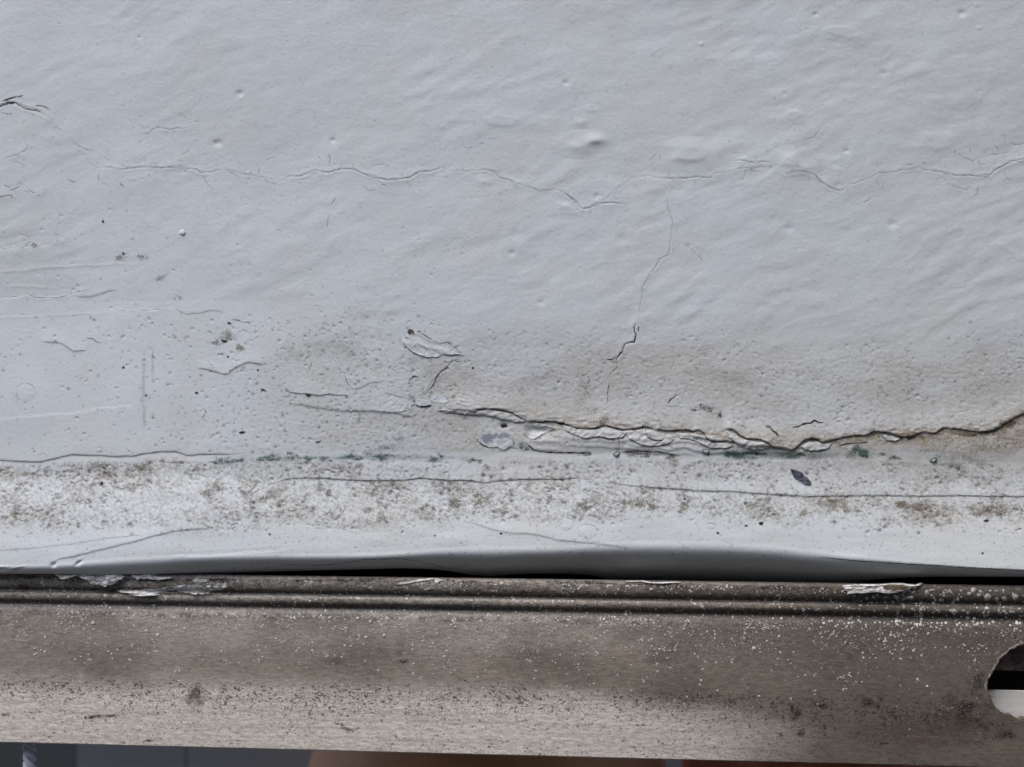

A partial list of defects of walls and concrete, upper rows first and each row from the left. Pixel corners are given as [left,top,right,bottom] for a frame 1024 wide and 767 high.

crack [0,95,57,127]
crack [301,157,434,191]
crack [607,205,673,403]
peeling [400,329,463,358]
peeling [362,381,449,412]
damp [258,453,361,461]
damp [723,451,764,459]
peeling [55,574,171,587]
peeling [843,583,922,594]